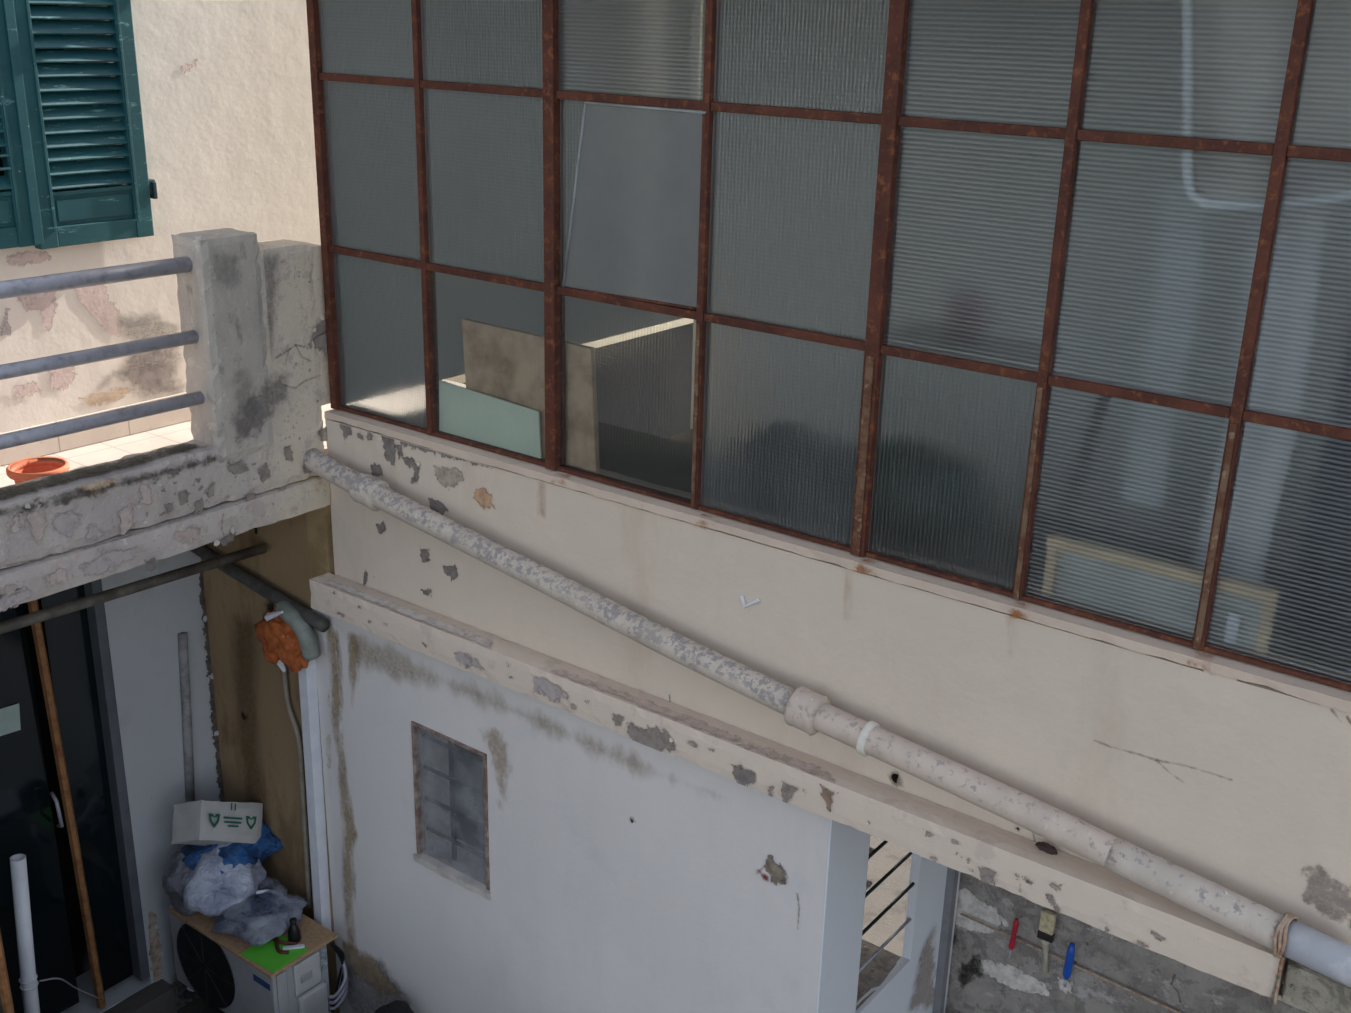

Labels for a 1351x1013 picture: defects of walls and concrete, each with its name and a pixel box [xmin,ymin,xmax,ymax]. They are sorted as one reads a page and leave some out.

peeling [6,251,51,268]
peeling [0,291,58,336]
peeling [75,285,124,337]
peeling [13,366,135,406]
peeling [227,460,286,502]
peeling [284,420,311,474]
peeling [318,424,495,515]
peeling [0,586,32,612]
peeling [533,670,838,812]